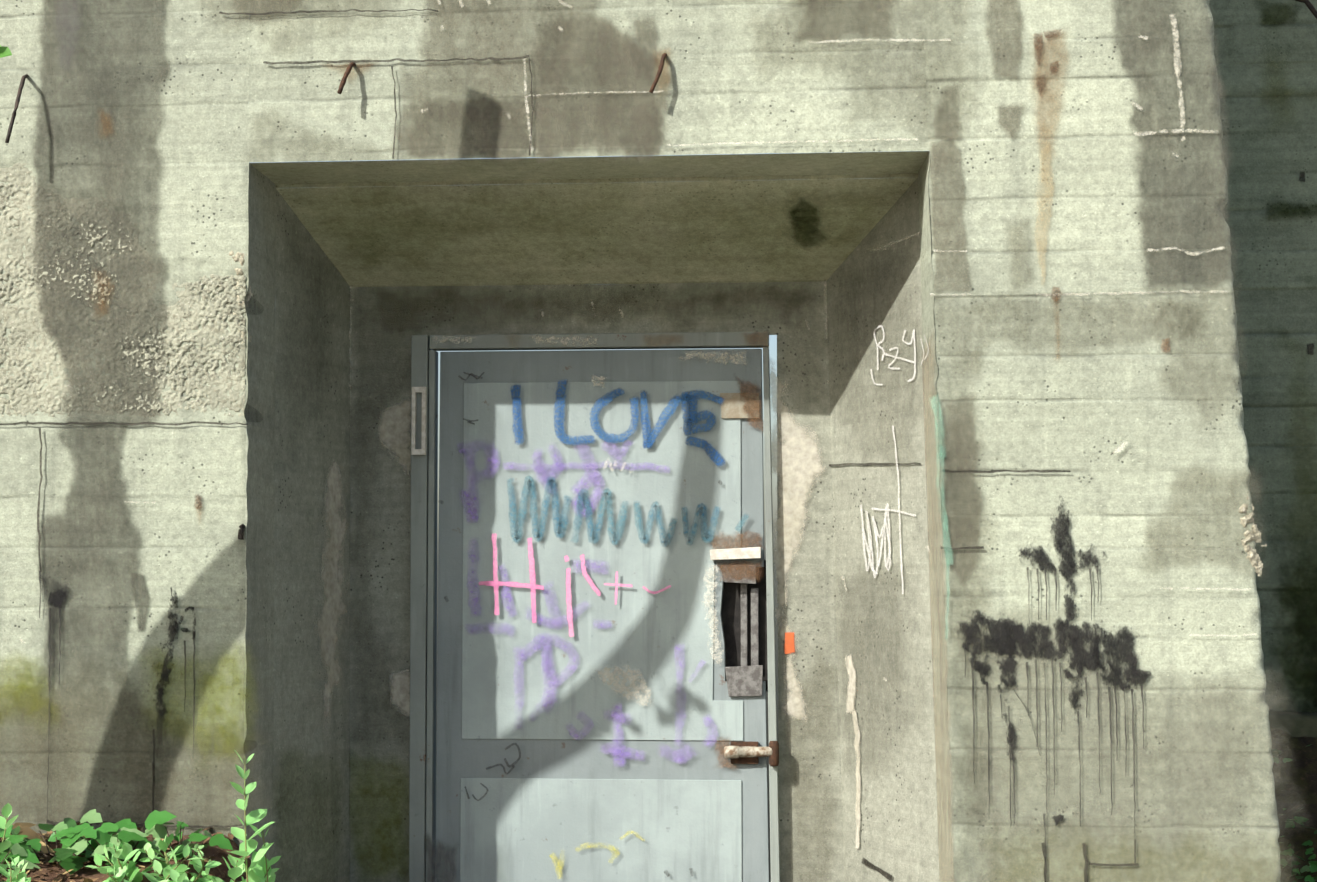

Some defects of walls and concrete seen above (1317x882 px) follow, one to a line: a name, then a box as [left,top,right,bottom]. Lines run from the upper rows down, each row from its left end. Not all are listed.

water stain [397,0,666,158]
corrosion [1034,30,1059,92]
water stain [1116,0,1233,293]
water stain [0,0,243,841]
water stain [961,566,1276,882]
crack [1039,843,1047,882]
crack [1082,839,1138,882]